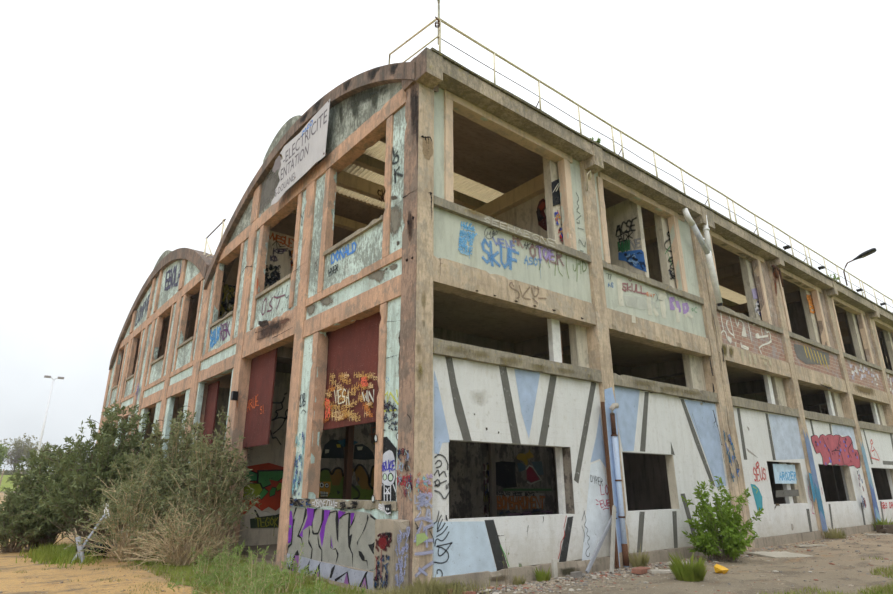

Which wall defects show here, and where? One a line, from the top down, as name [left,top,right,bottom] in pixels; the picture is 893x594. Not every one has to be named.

water stain [339,68,388,123]
peeling [390,195,414,246]